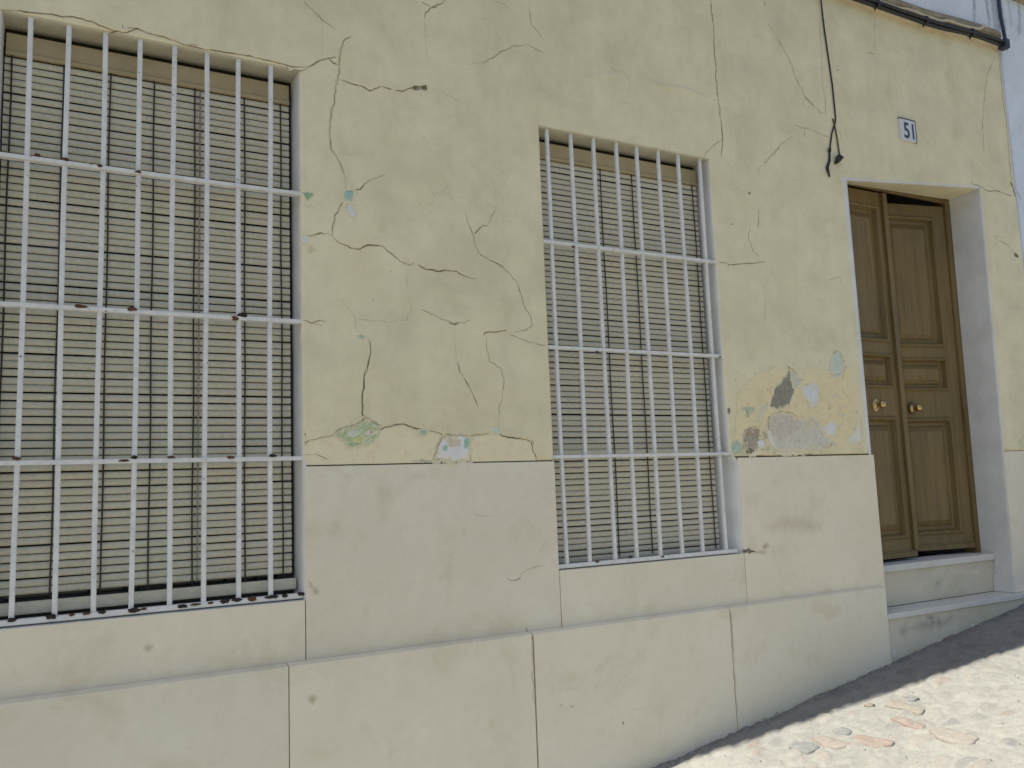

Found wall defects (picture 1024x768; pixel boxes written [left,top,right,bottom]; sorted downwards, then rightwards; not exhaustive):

crack [345,77,430,95]
crack [708,2,723,154]
crack [324,203,475,279]
crack [362,341,379,425]
peeling [305,415,540,467]
peeling [728,362,838,457]
rust [178,592,305,608]